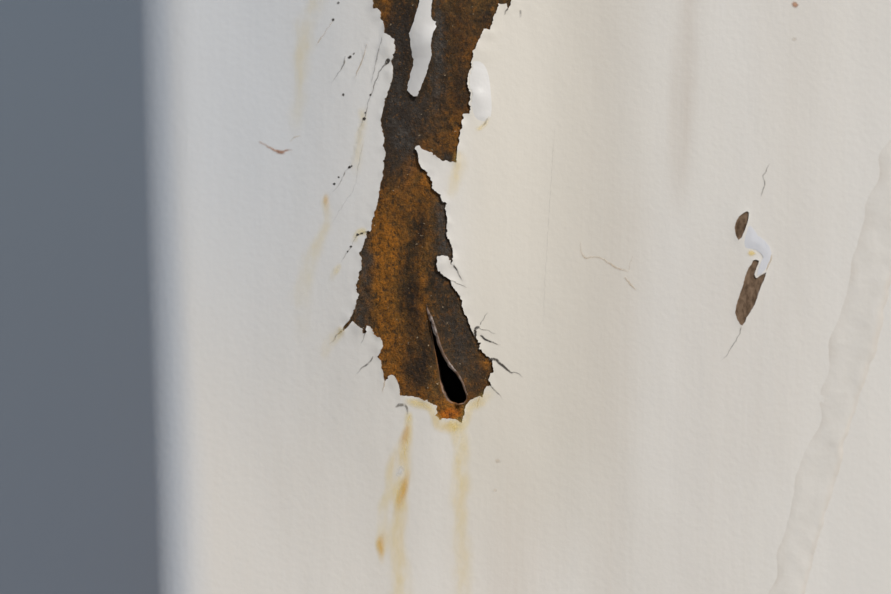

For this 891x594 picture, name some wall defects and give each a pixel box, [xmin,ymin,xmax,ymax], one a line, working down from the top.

rust [335,0,513,423]
peeling [735,211,772,331]